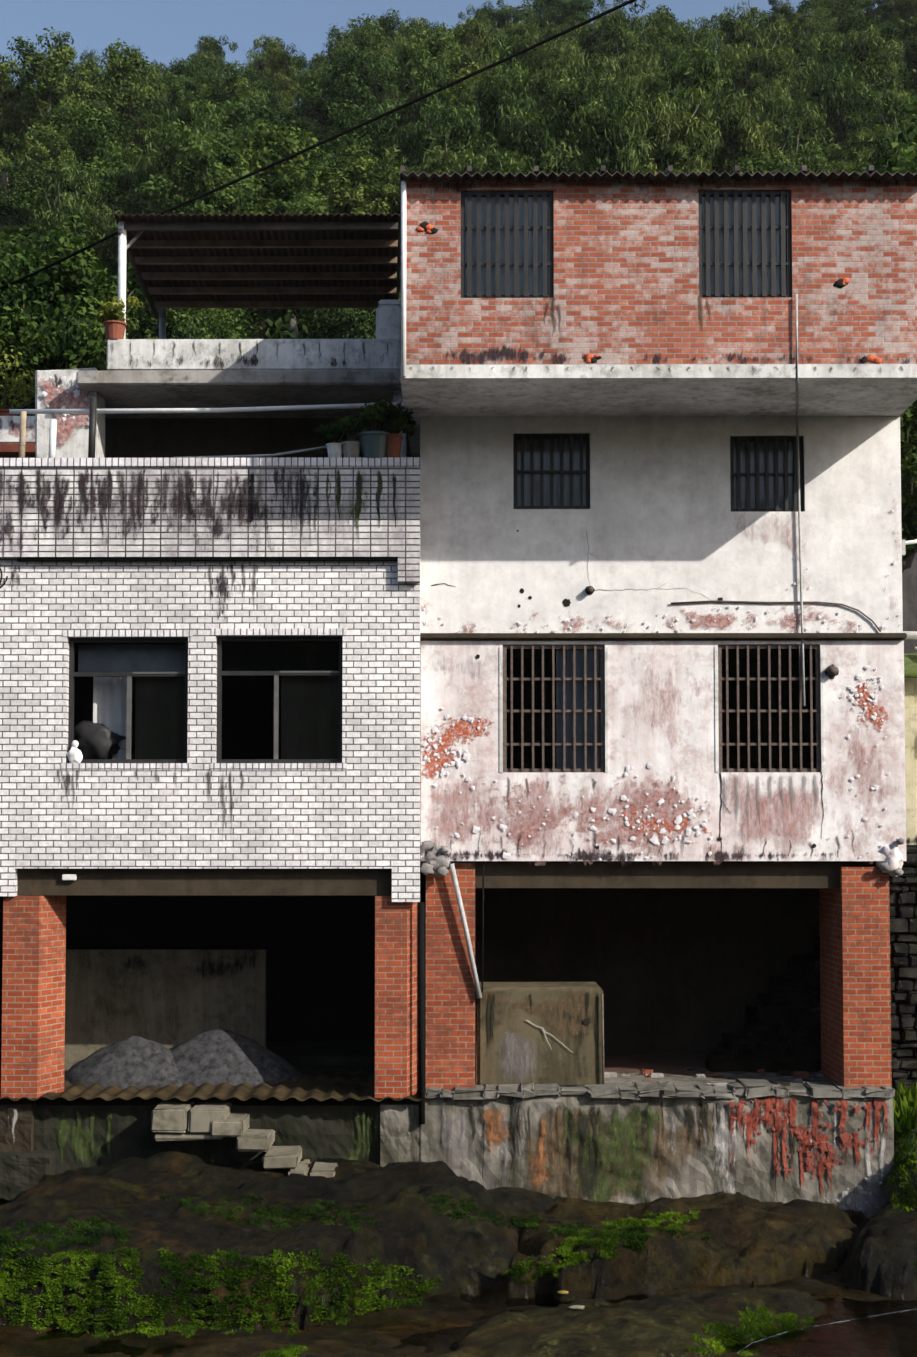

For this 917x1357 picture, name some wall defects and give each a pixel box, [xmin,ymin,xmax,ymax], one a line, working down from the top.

peeling [37,376,93,445]
leakage [0,457,396,619]
peeling [422,561,902,633]
leakage [57,770,79,803]
leakage [207,772,243,828]
leakage [424,779,690,865]
peeling [420,707,722,861]
leakage [706,776,855,862]
peeling [824,664,890,827]
leakage [500,1098,765,1199]
peeling [726,1096,888,1213]
leakage [865,1105,885,1189]